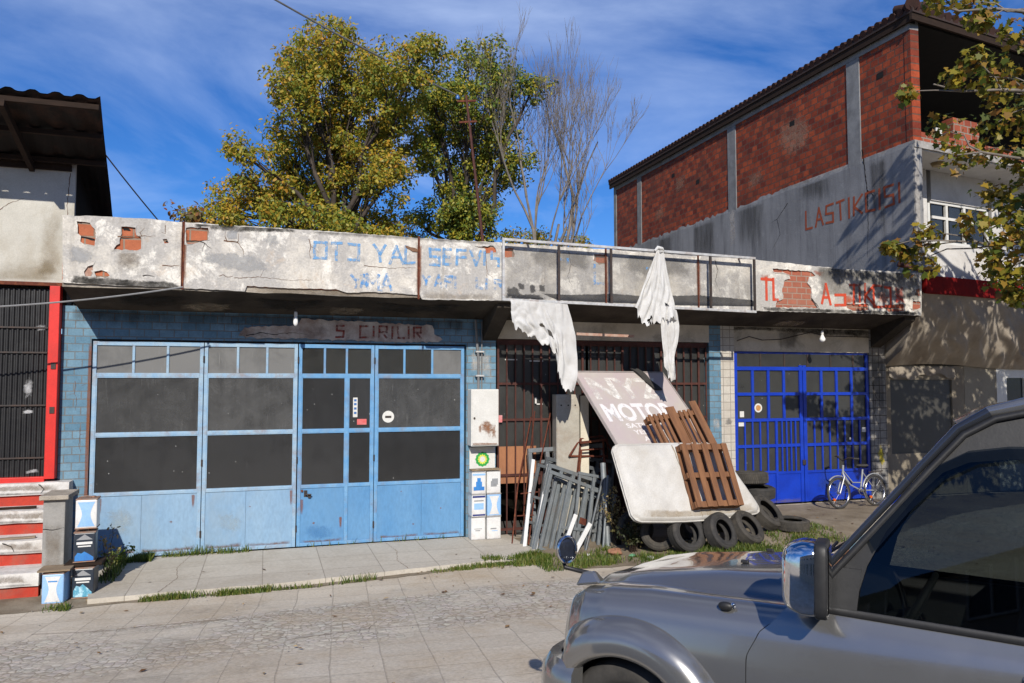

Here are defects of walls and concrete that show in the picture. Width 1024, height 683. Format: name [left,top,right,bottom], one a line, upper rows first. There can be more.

crack [861,150,873,225]
flaking render [75,220,112,279]
flaking render [111,223,141,254]
flaking render [184,226,212,246]
crack [200,232,315,281]
leakage [629,244,687,274]
flaking render [771,267,818,326]